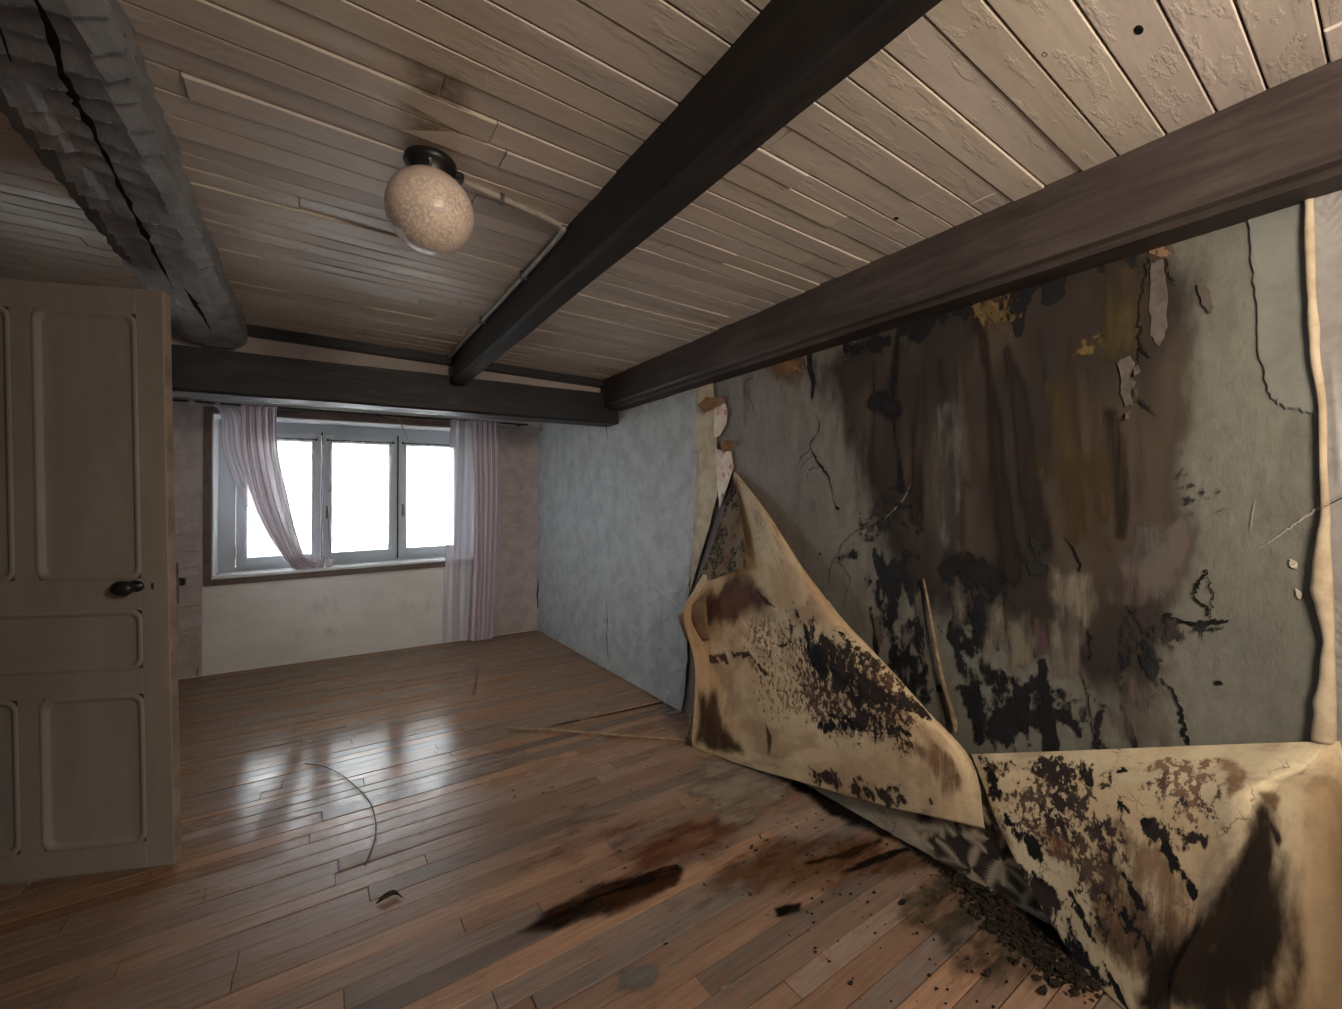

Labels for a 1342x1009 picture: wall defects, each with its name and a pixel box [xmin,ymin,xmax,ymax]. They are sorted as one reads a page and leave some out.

crack [0,28,12,62]
crack [34,0,212,331]
peeling [1117,356,1140,419]
crack [1250,498,1342,550]
water stain [524,249,1303,1009]